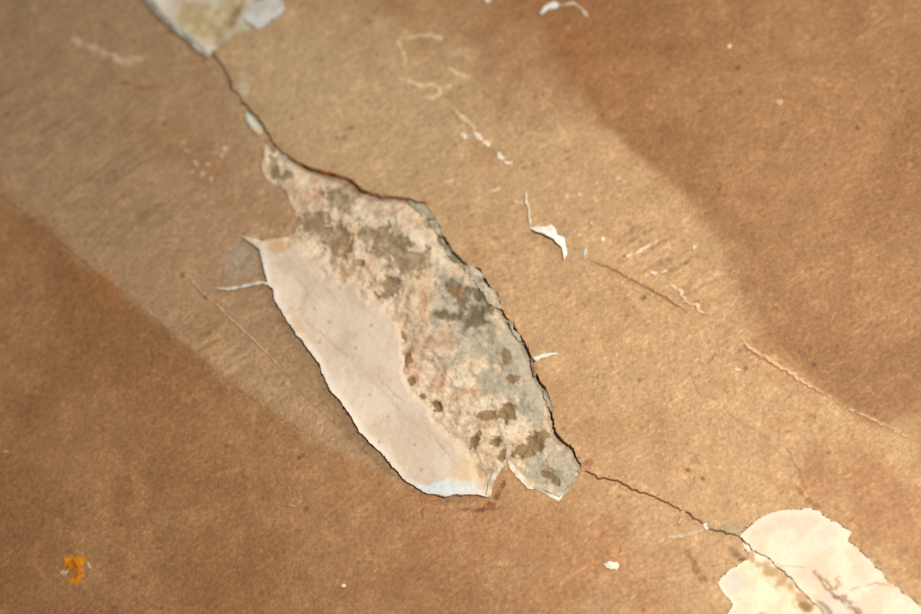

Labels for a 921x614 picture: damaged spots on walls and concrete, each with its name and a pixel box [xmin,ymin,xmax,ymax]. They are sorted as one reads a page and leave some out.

peeling [146,0,285,59]
crack [209,50,279,153]
peeling [453,108,512,165]
flaking render [209,142,581,501]
crack [577,469,741,541]
corrosion [60,552,92,585]
peeling [718,508,921,614]